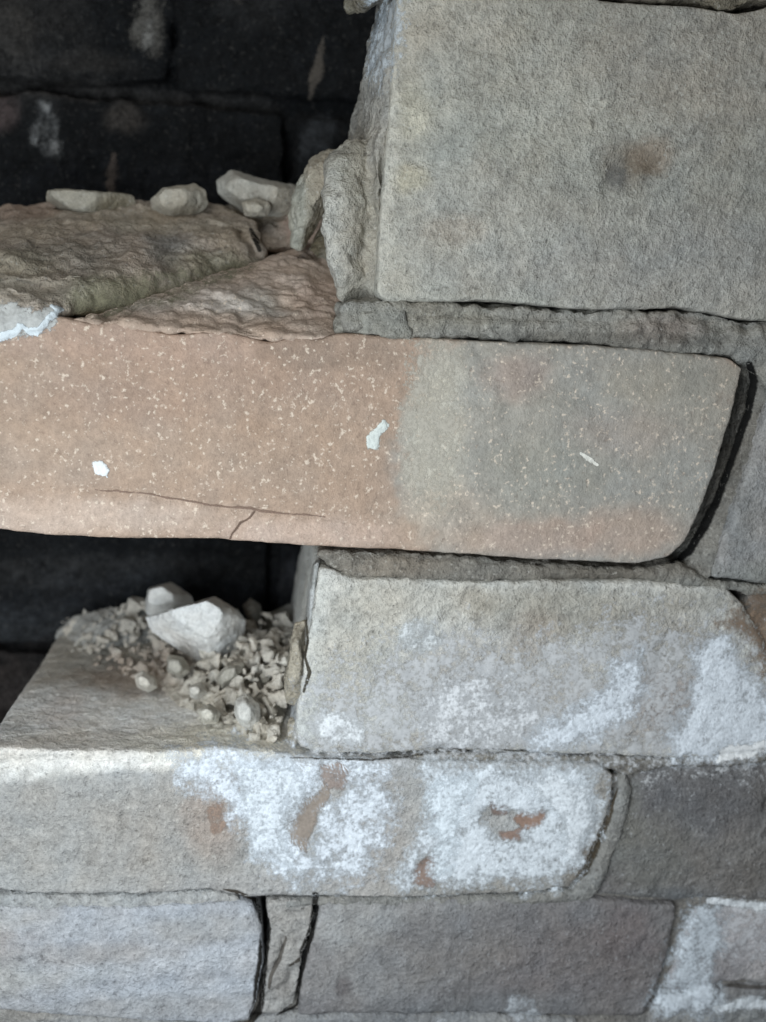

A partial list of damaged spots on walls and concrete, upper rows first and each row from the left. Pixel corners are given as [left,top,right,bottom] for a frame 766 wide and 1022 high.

peeling [0,301,64,342]
spalling [74,149,341,342]
crack [669,362,758,563]
damp [168,592,766,898]
crack [223,889,319,1022]
damp [646,896,766,1022]